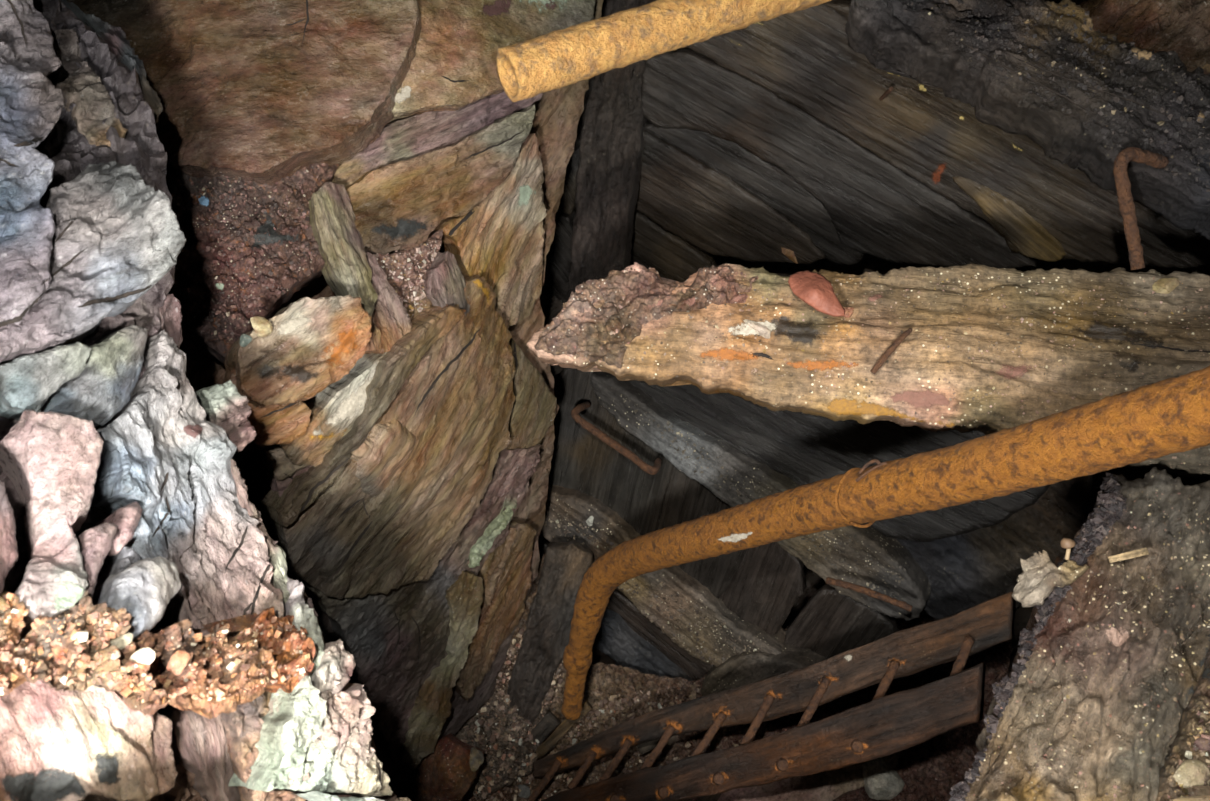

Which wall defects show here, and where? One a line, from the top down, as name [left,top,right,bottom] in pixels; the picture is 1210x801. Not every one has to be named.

rust [700,348,758,361]
rust [786,360,858,371]